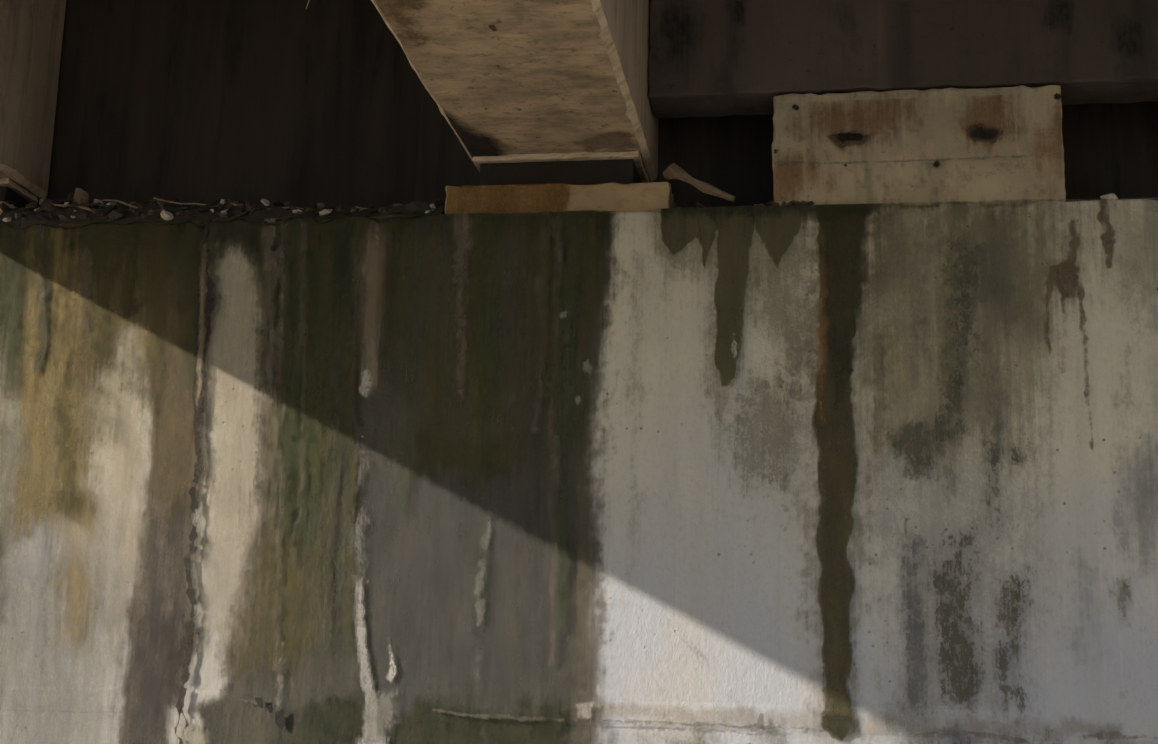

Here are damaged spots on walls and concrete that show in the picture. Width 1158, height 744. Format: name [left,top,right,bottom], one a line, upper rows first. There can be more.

crack [175,220,216,744]
water stain [0,210,616,744]
water stain [661,205,801,386]
water stain [786,210,1011,740]
water stain [901,528,1033,711]
water stain [984,374,1023,520]